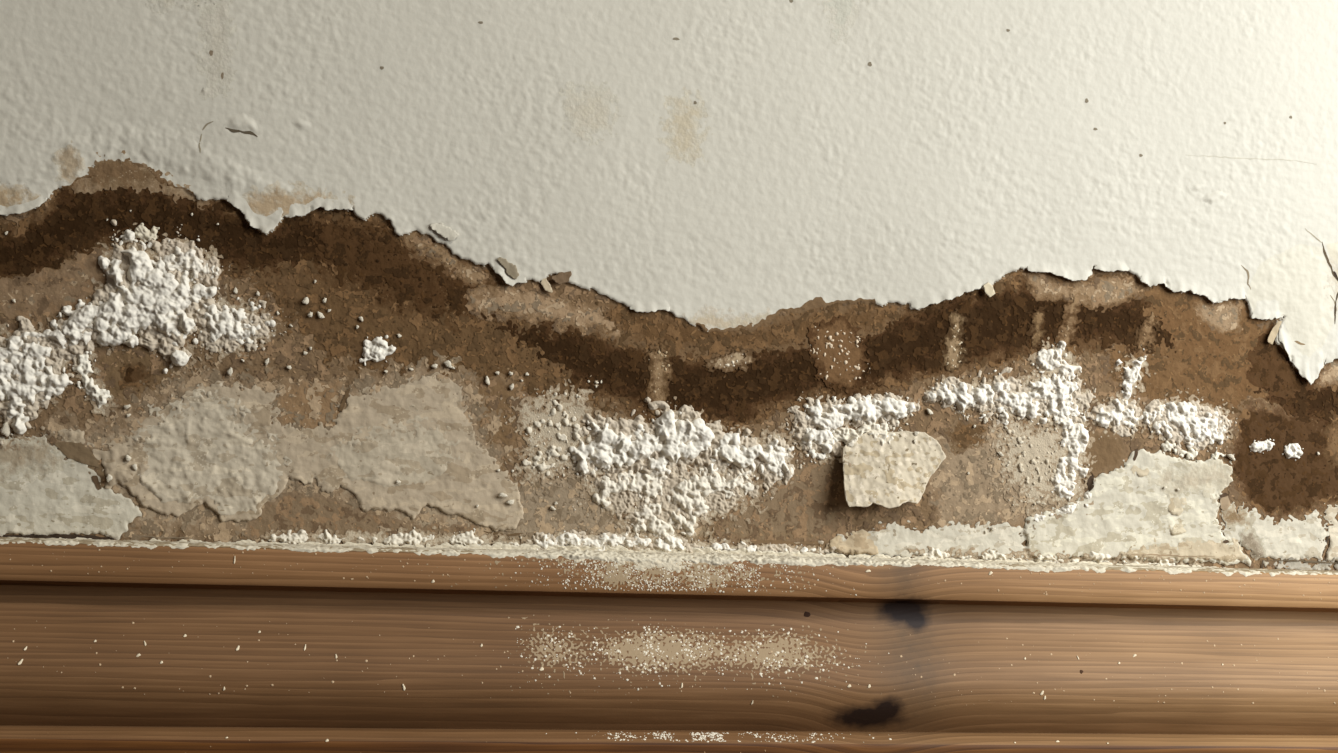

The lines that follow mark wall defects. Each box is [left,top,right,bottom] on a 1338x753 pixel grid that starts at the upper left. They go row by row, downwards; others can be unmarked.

water stain [0,162,1338,581]
peeling [0,182,1338,571]
crack [1306,230,1338,322]